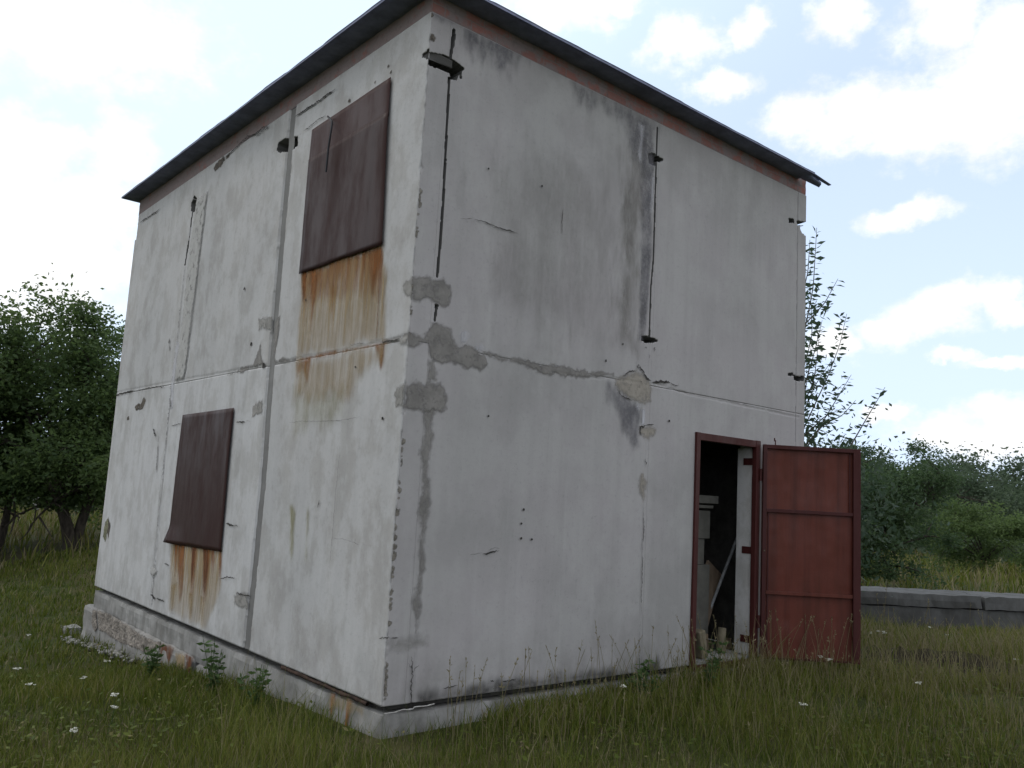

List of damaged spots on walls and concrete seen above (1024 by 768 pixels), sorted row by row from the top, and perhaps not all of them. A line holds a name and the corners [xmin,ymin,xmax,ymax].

corrosion [298,247,386,387]
water stain [640,245,650,327]
corrosion [171,544,221,614]
spalling [388,481,402,626]